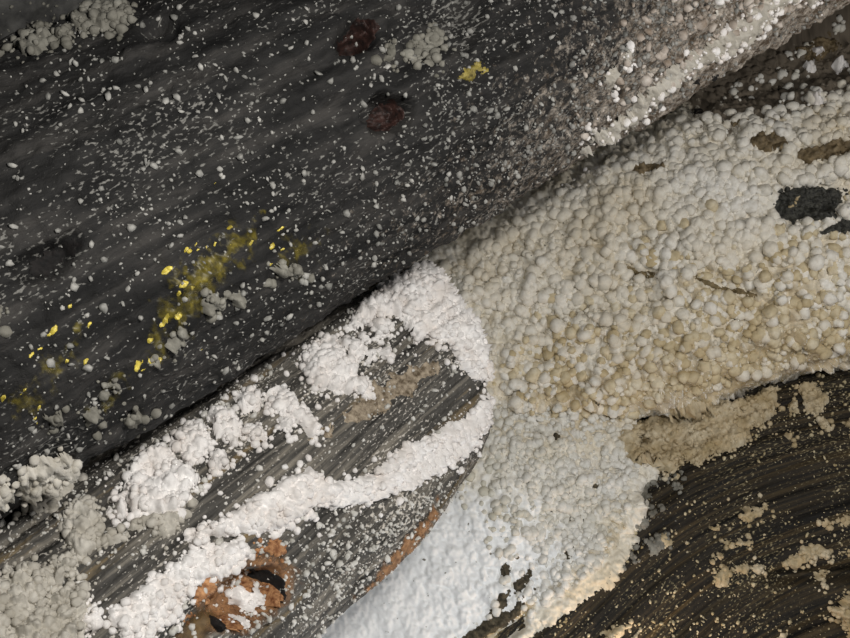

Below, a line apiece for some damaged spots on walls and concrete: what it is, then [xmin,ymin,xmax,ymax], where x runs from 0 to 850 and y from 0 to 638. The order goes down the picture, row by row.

leakage [458,61,489,82]
leakage [561,0,827,189]
leakage [831,55,849,75]
spalling [771,186,850,235]
leakage [0,242,496,638]
leakage [618,333,850,571]
corrosion [183,538,293,634]
corrosion [366,497,439,592]
leakage [600,615,642,638]
leakage [706,519,772,588]
leakage [782,538,850,638]